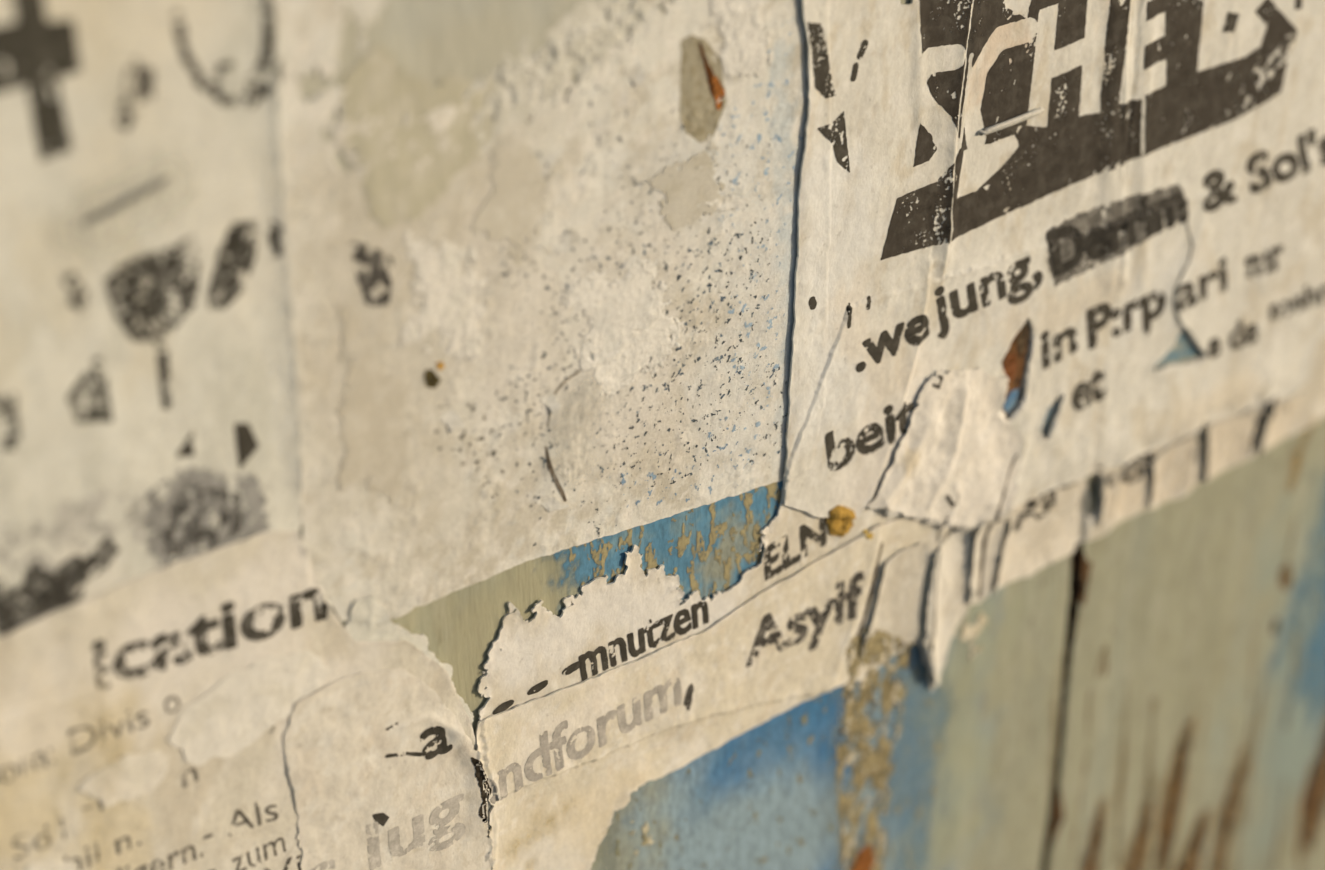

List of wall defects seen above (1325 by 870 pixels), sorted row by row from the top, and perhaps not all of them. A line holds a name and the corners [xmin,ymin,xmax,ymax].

peeling [596,626,916,870]
crack [1040,541,1114,870]